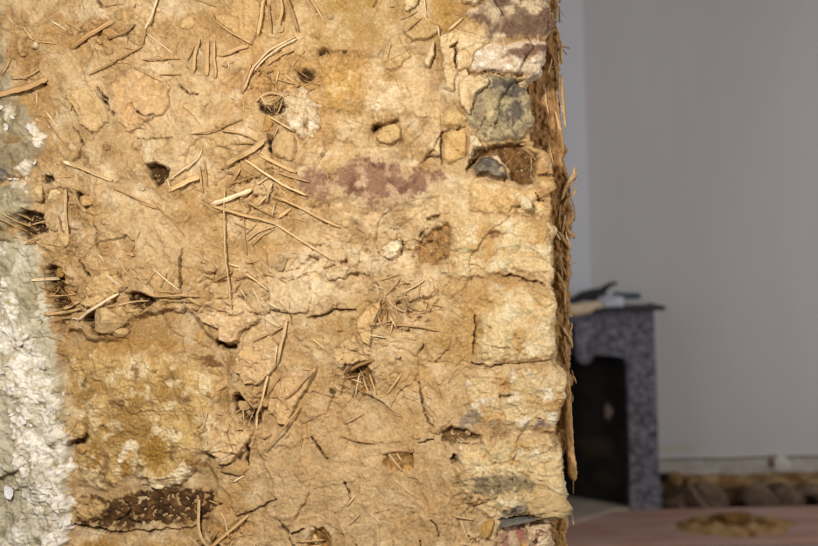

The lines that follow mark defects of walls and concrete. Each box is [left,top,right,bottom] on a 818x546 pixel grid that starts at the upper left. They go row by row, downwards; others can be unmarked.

crack [67,98,84,162]
crack [97,87,155,117]
spalling [279,0,557,213]
crack [78,222,98,278]
crack [176,248,184,292]
crack [503,273,545,285]
crack [306,309,357,320]
flaking render [376,211,569,546]
crack [418,382,435,444]
crack [66,502,197,536]
crack [236,499,304,546]